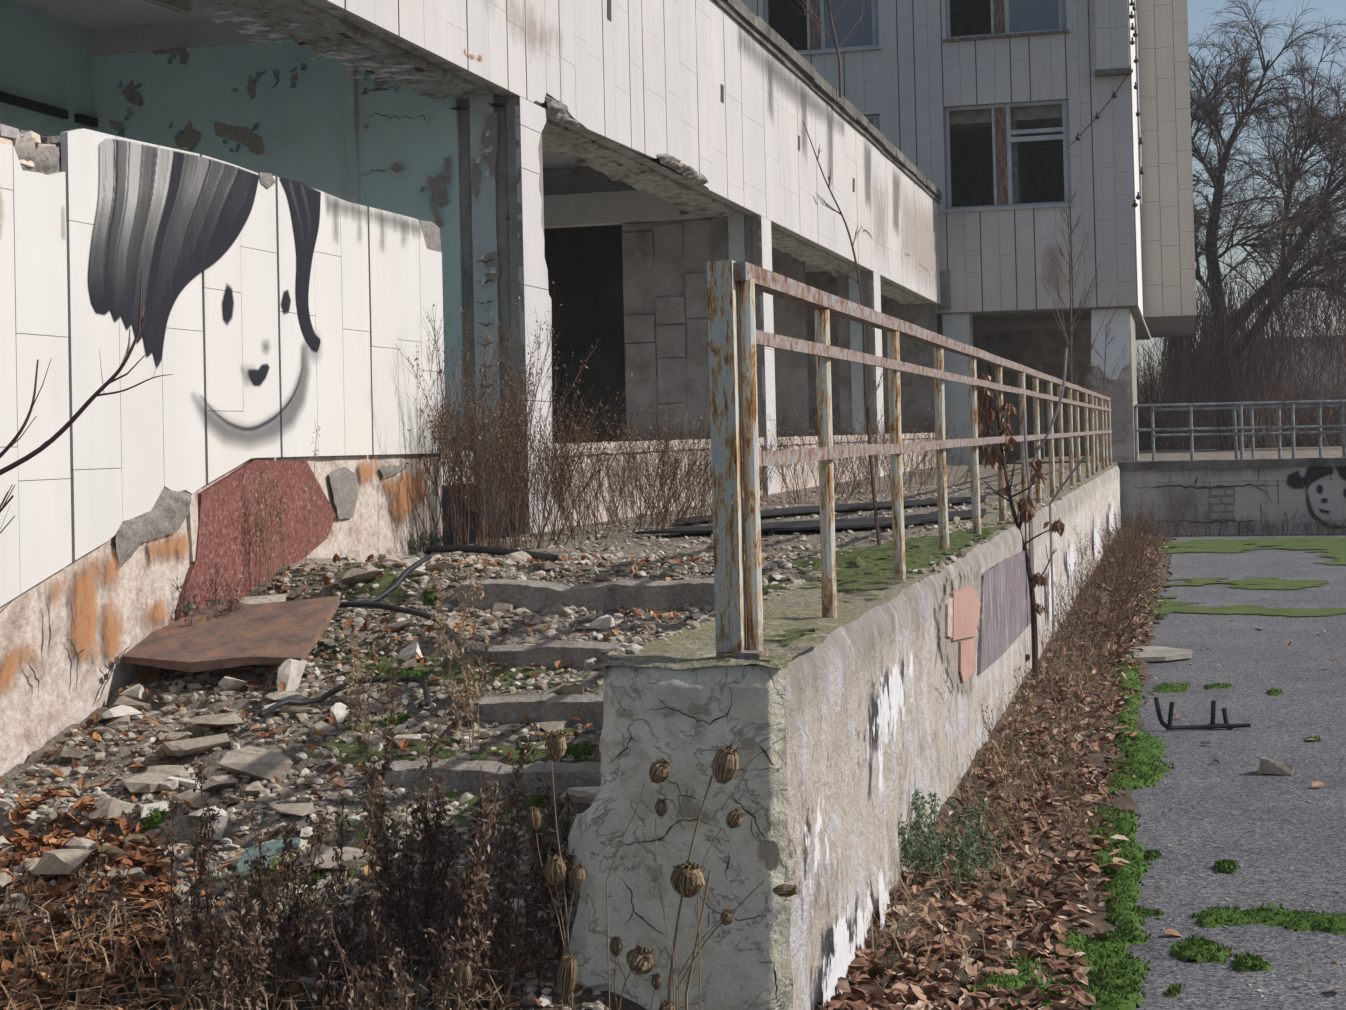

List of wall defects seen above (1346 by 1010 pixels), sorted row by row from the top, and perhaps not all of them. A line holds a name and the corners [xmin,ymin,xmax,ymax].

spalling [0,124,61,175]
peeling [168,122,265,156]
peeling [419,157,451,252]
spalling [657,154,709,186]
damp [765,59,835,171]
crack [612,686,732,762]
crack [755,742,775,770]
peeling [867,648,914,795]
crack [612,779,772,927]
crack [621,878,666,937]
peeling [822,868,891,1005]
crack [761,961,778,1003]